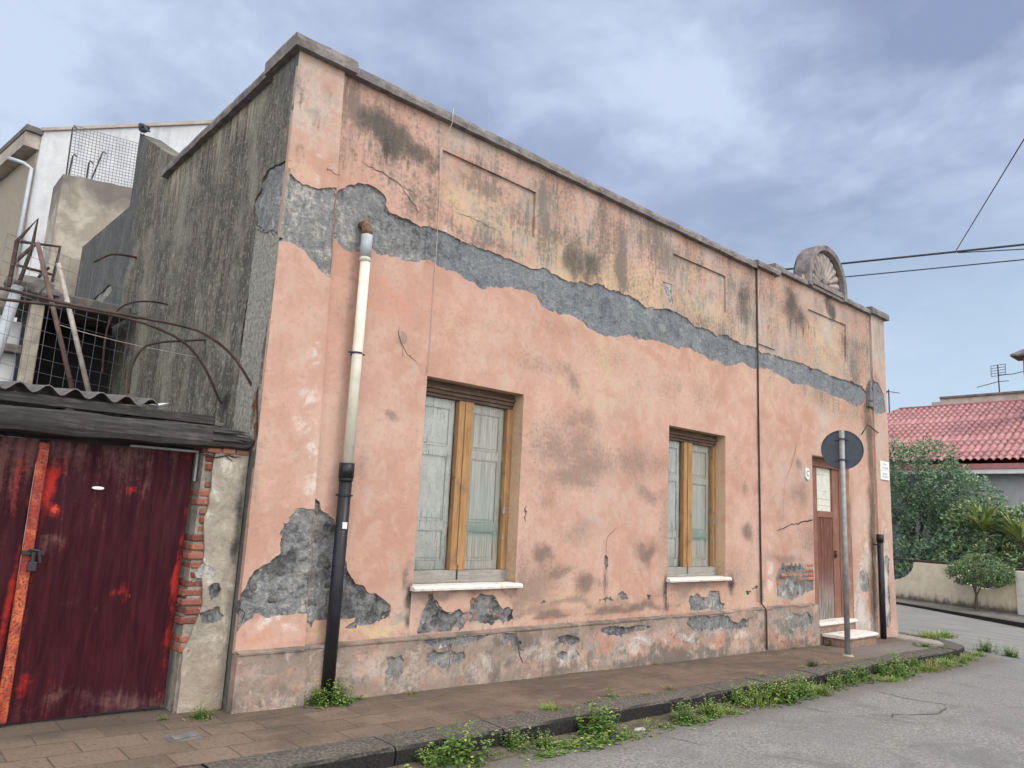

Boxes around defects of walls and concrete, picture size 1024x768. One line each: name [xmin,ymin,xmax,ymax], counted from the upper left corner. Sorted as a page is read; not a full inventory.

leakage [360,110,431,169]
spalling [255,162,885,414]
spalling [195,564,223,624]
spalling [237,499,394,633]
spalling [385,655,403,679]
spalling [417,591,522,669]
spalling [556,635,579,660]
spalling [687,591,748,632]
spalling [774,562,814,630]